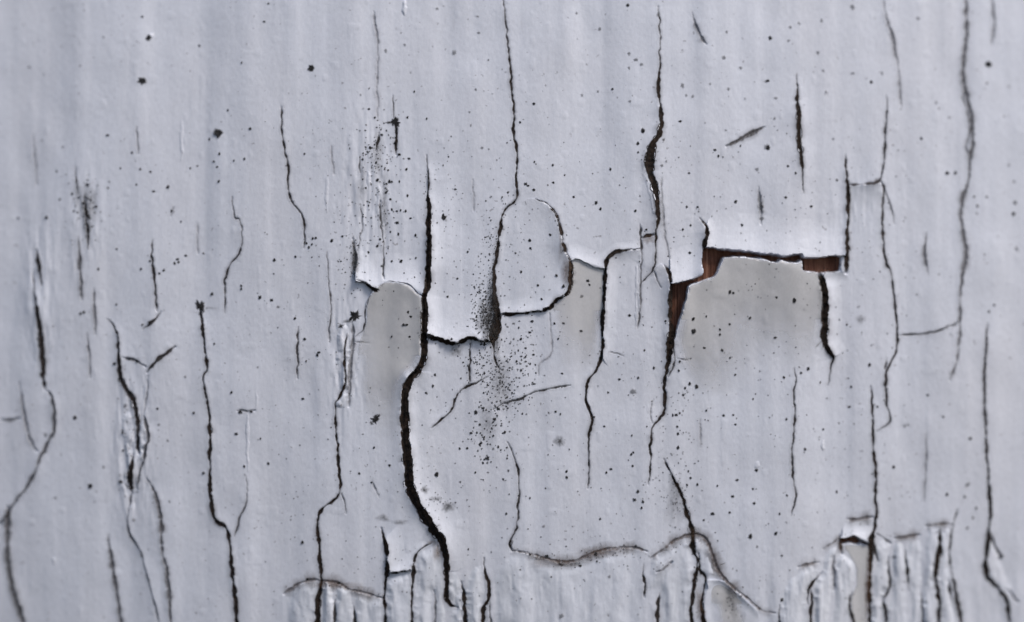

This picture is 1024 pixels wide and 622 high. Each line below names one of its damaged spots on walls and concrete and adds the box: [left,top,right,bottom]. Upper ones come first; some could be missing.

crack [2,253,56,622]
crack [75,172,173,622]
crack [200,317,246,622]
crack [289,2,574,622]
peeling [335,182,883,573]
crack [504,15,780,622]
peeling [641,156,655,215]
crack [795,83,804,185]
peeling [840,521,873,622]
crack [802,0,975,622]
crack [982,328,1016,622]
peeling [987,540,1012,592]